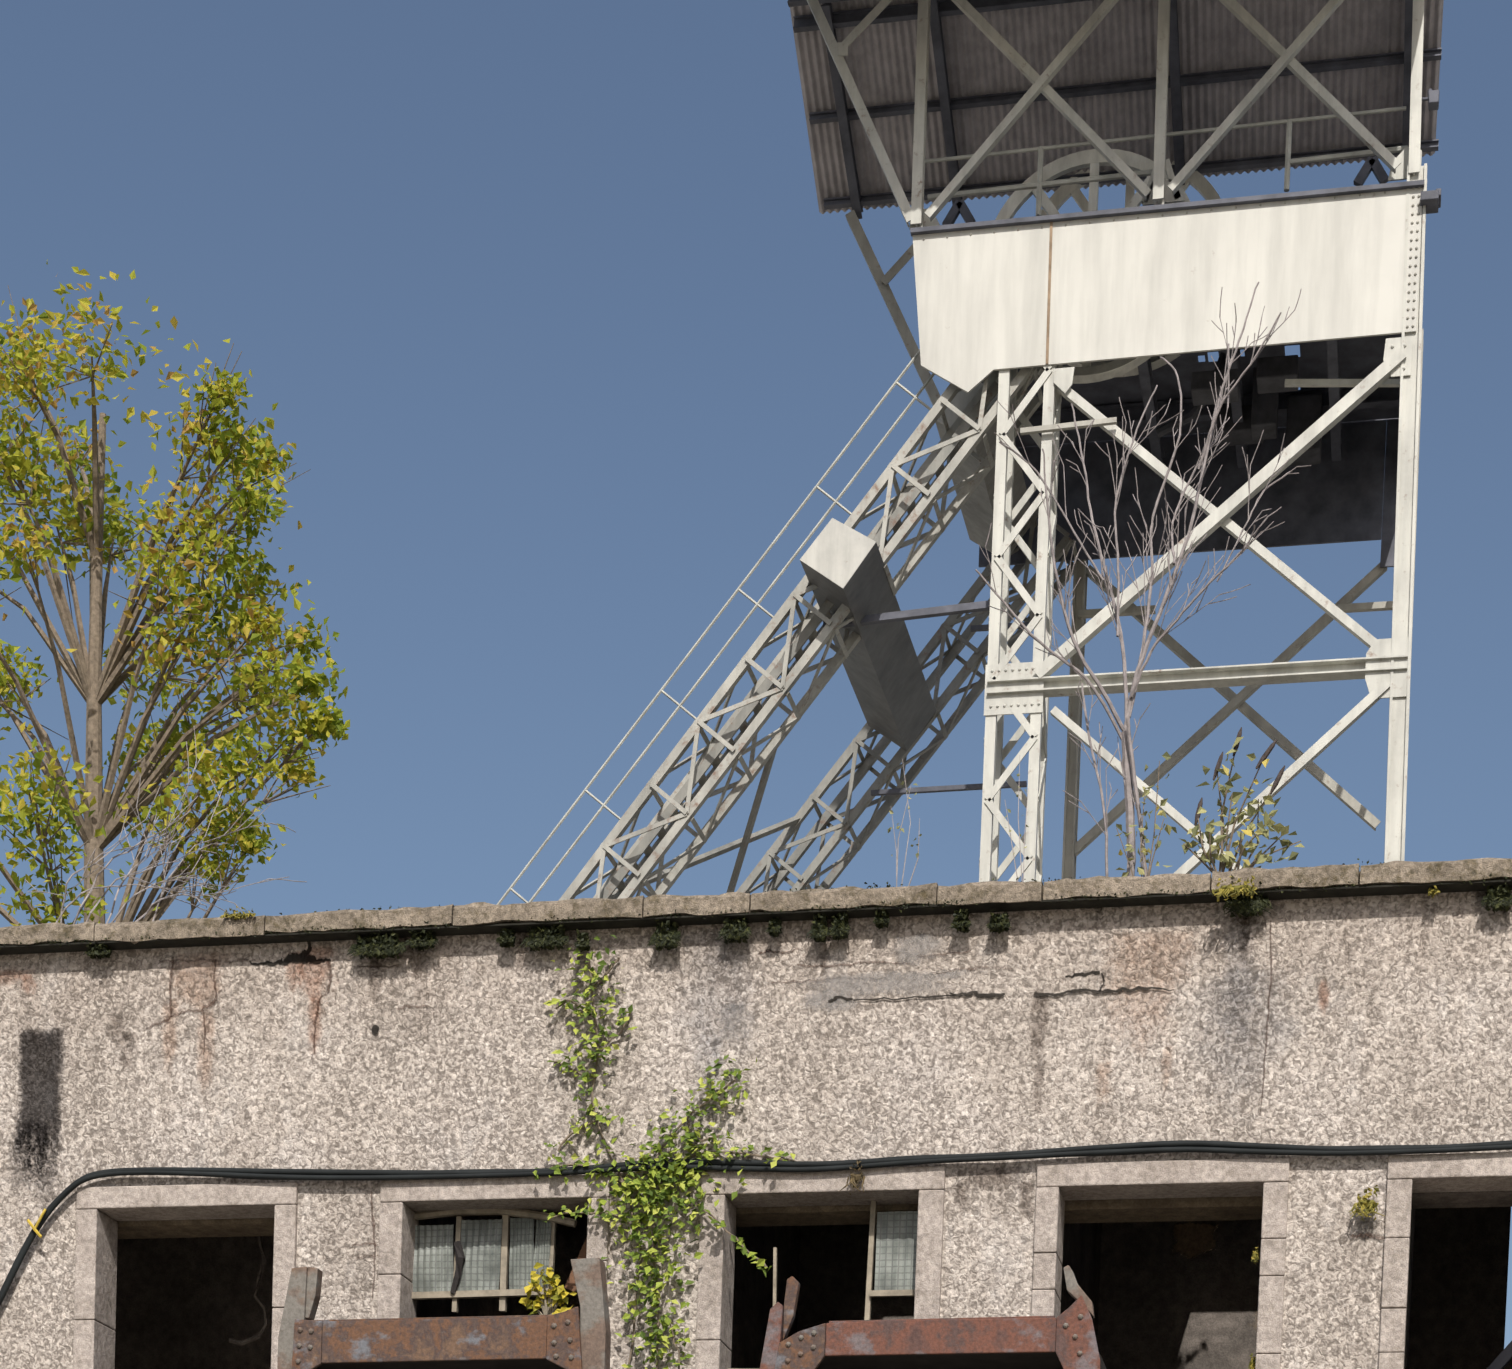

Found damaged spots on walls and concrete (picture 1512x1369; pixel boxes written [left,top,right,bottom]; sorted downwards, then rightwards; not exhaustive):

crack [146,942,401,1055]
crack [397,1002,430,1010]
crack [759,948,1174,1003]